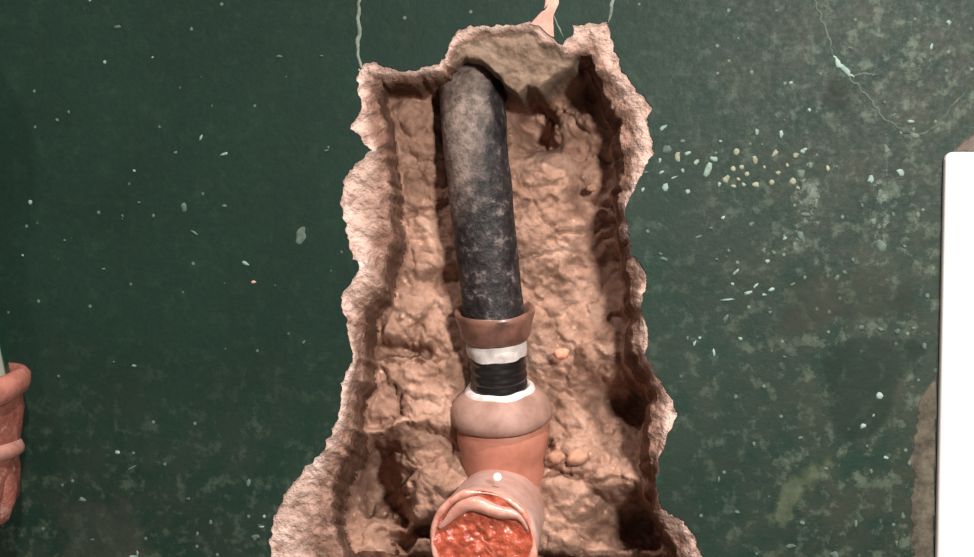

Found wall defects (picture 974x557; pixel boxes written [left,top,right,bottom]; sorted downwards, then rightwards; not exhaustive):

crack [355,0,363,69]
crack [813,0,965,135]
spalling [718,148,818,217]
spalling [252,0,718,557]